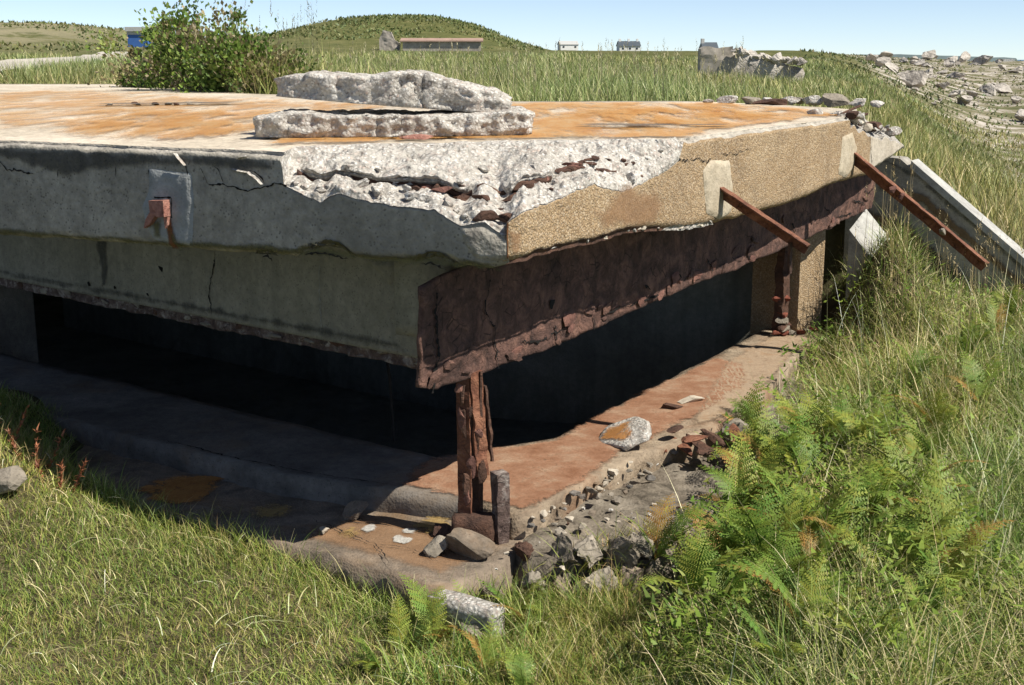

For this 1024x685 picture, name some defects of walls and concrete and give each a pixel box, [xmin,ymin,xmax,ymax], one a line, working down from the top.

rust [154,220,181,249]
crack [207,258,215,312]
crack [200,168,287,192]
spalling [283,137,714,264]
rust [638,237,761,307]
rust [860,196,950,271]
rust [901,188,1024,290]
rust [506,345,523,361]
rust [544,300,617,345]
rust [402,358,745,508]